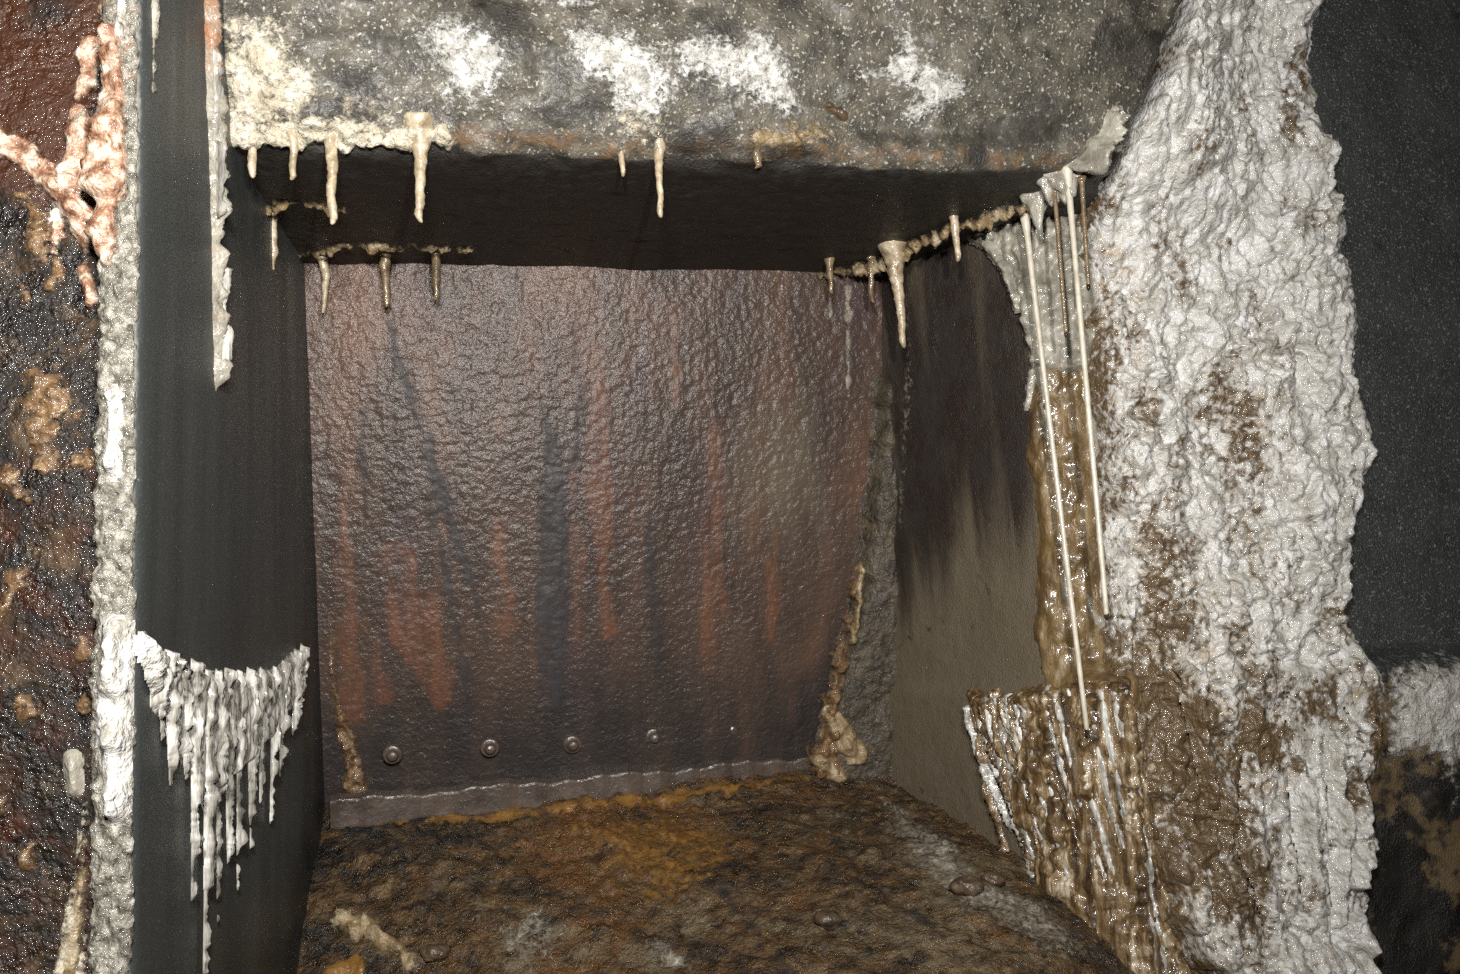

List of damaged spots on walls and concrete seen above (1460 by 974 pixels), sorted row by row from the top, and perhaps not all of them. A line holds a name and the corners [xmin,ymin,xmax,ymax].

water stain [536,0,834,152]
water stain [817,257,887,397]
efflorescence [0,0,310,974]
water stain [856,0,1460,974]
efflorescence [325,615,367,793]
efflorescence [806,555,868,784]